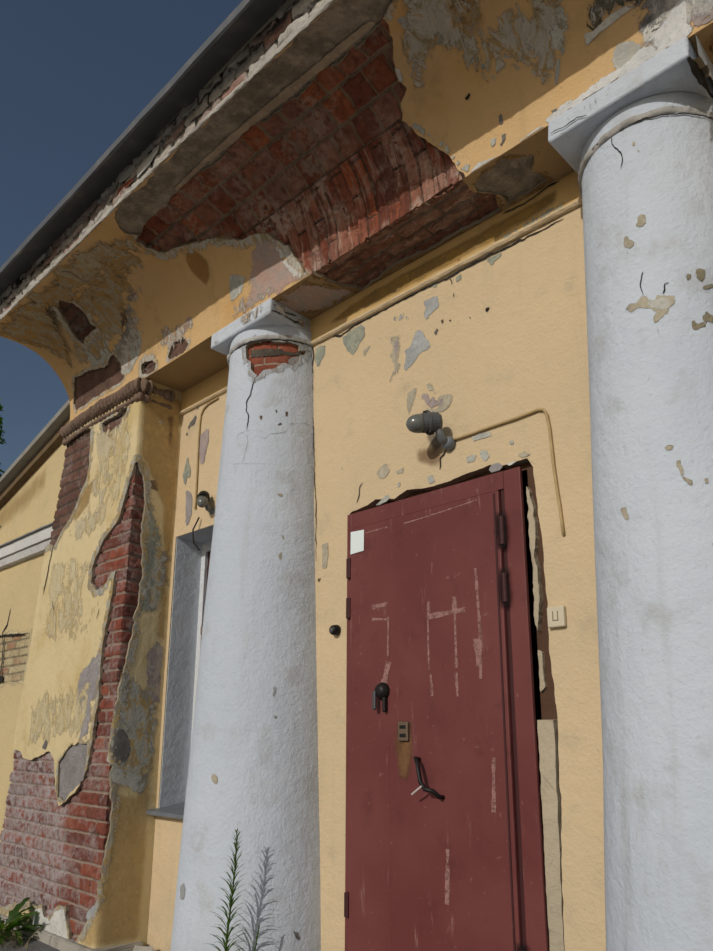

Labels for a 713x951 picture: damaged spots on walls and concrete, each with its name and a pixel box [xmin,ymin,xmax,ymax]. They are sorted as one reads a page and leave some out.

peeling [591,0,713,69]
spalling [687,57,713,99]
crack [592,112,713,165]
flaking render [0,0,572,414]
peeling [626,272,675,334]
peeling [686,268,713,291]
peeling [692,312,713,330]
crack [234,378,316,554]
flaking render [0,415,171,943]